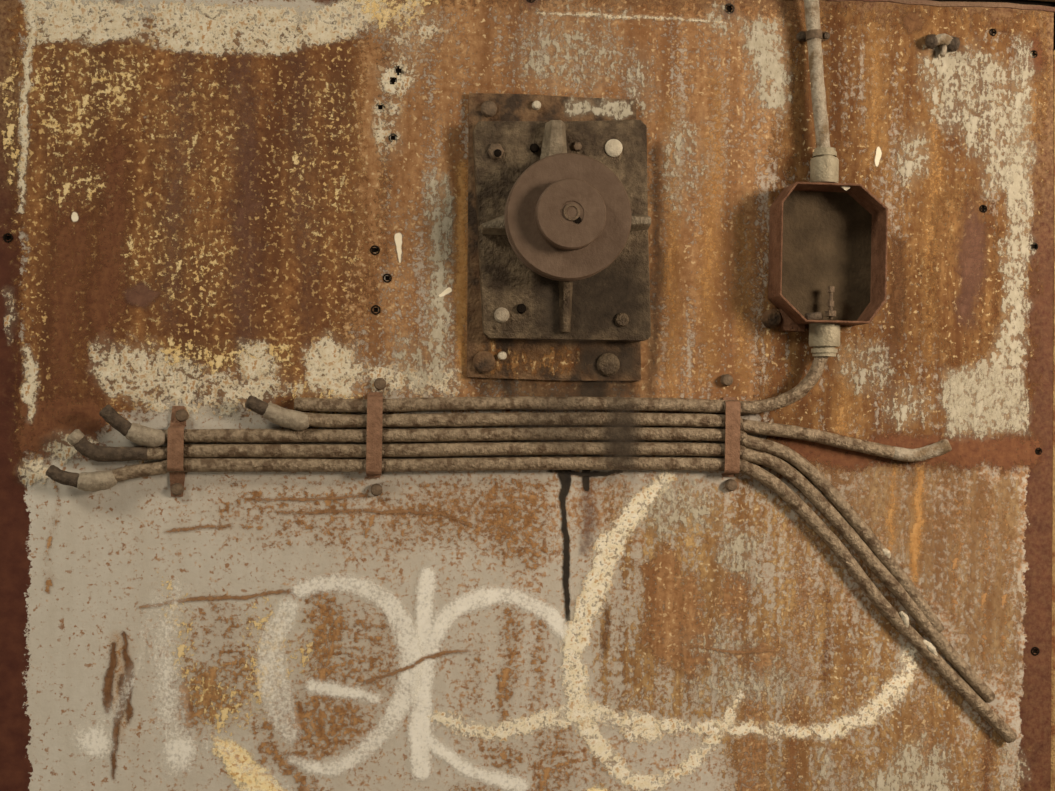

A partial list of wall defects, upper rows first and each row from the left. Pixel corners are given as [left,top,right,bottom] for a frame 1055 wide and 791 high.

peeling [0,0,448,214]
rust [3,0,816,475]
peeling [1,290,41,424]
rust [582,2,1052,791]
rust [219,477,556,574]
peeling [637,478,769,584]
rust [102,631,134,779]
rust [161,575,400,791]
rust [481,607,614,791]
peeling [685,623,804,702]
peeling [851,732,954,791]